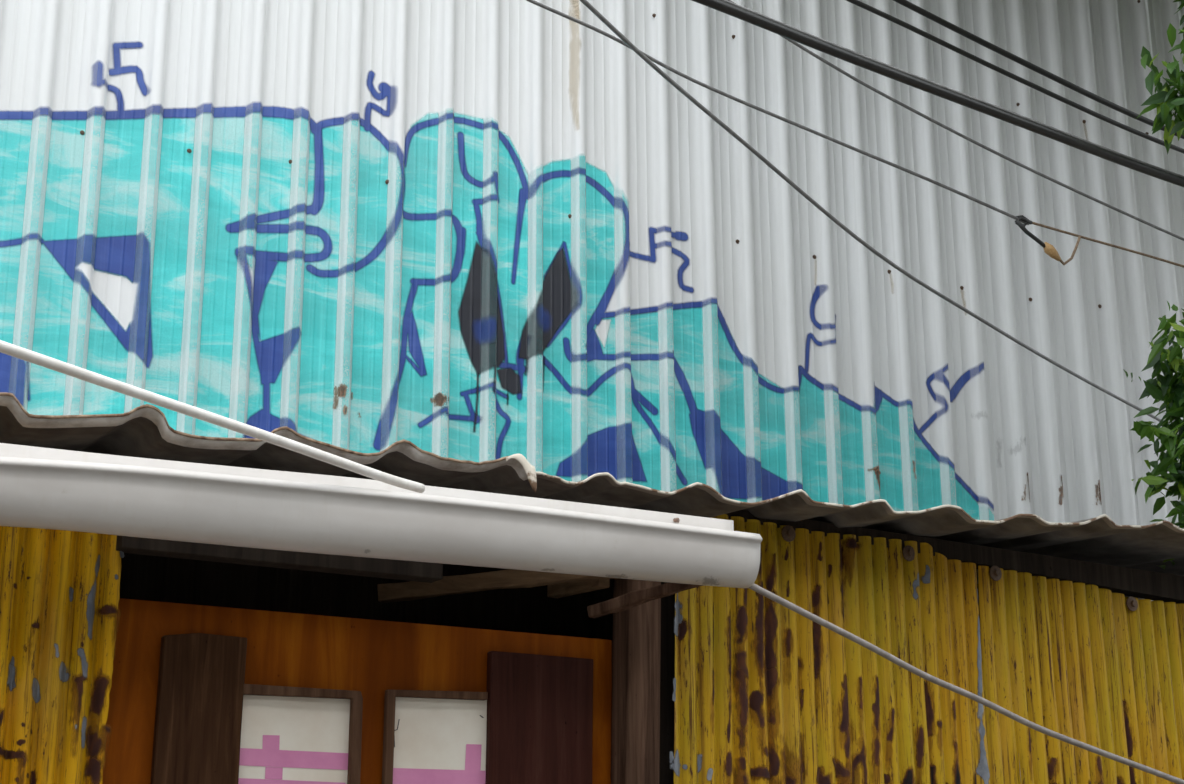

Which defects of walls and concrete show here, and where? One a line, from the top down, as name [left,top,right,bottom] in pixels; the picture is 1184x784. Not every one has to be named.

rust [0,392,520,465]
rust [333,384,360,417]
peeling [54,555,100,683]
peeling [674,593,683,636]
peeling [7,656,16,691]
rust [0,723,37,784]
peeling [32,678,41,703]
rust [71,672,111,784]
peeling [669,750,713,781]
rust [724,537,976,784]
peeling [976,615,990,784]
rust [1074,700,1136,784]